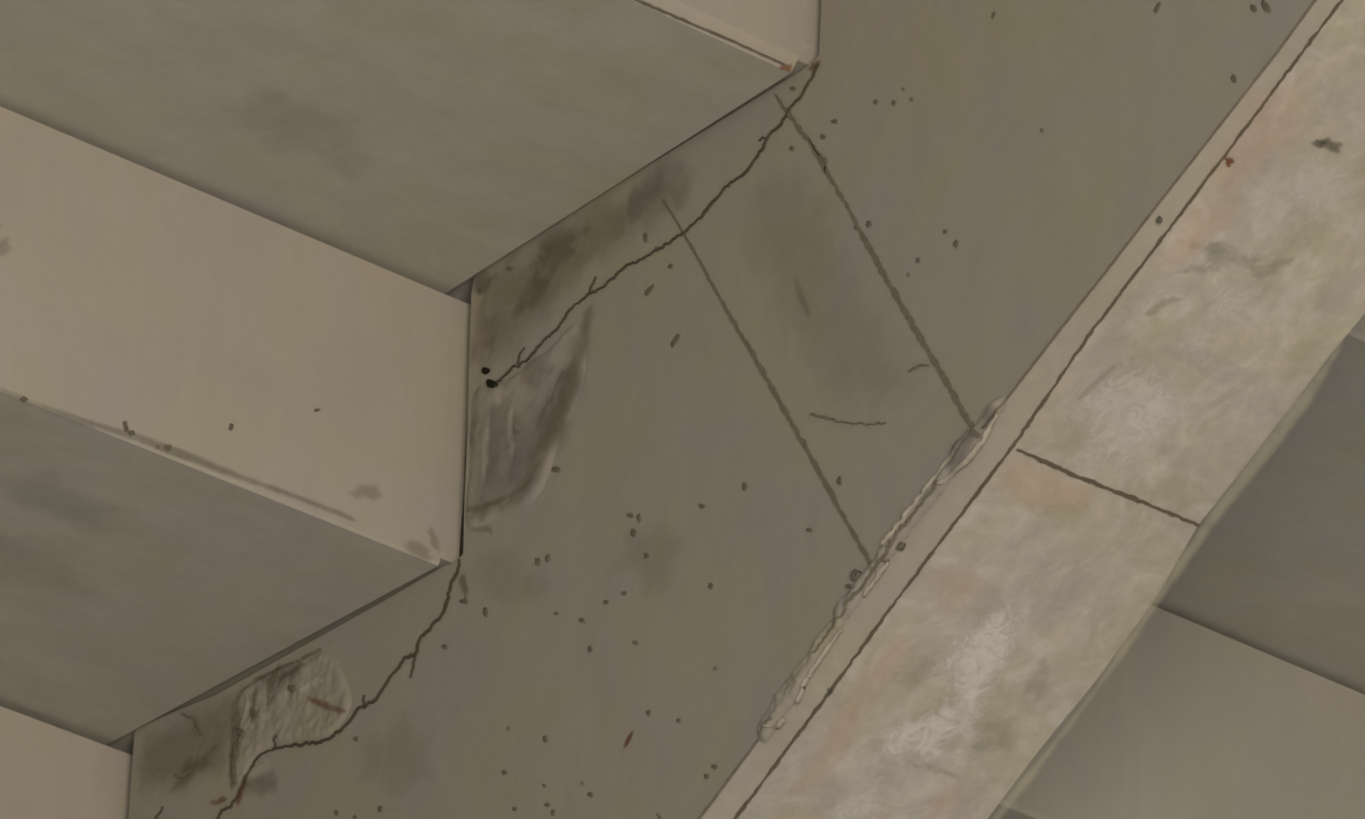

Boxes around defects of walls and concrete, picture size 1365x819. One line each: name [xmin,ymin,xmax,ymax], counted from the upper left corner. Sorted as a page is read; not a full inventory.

crack [496,63,819,383]
crack [154,559,461,819]